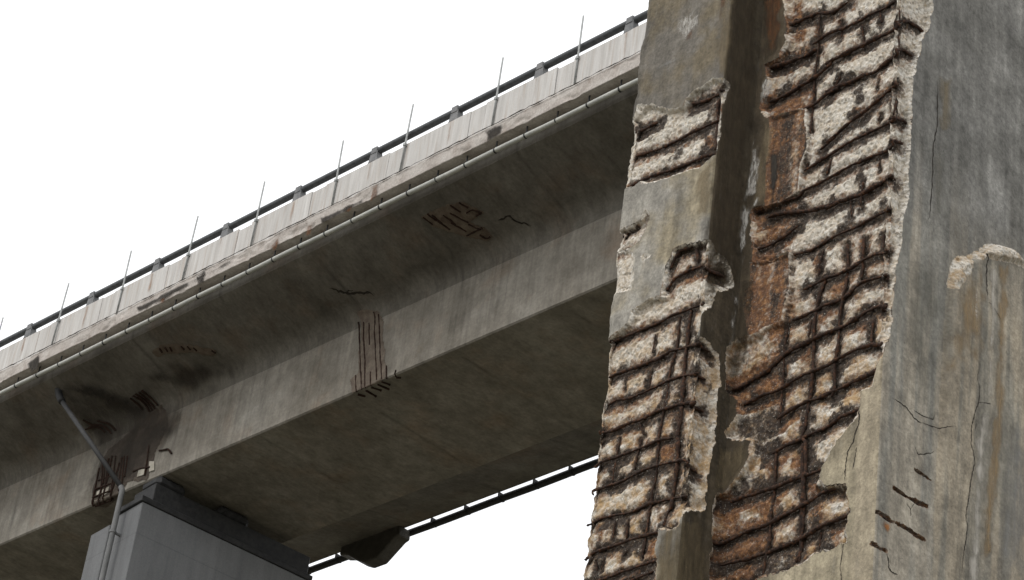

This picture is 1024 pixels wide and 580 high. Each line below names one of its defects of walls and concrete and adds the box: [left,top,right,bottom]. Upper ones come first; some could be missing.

crack [0,50,641,371]
spalling [583,0,934,580]
rust [744,253,789,335]
rust [758,109,807,206]
crack [981,252,1000,318]
crack [895,368,990,578]